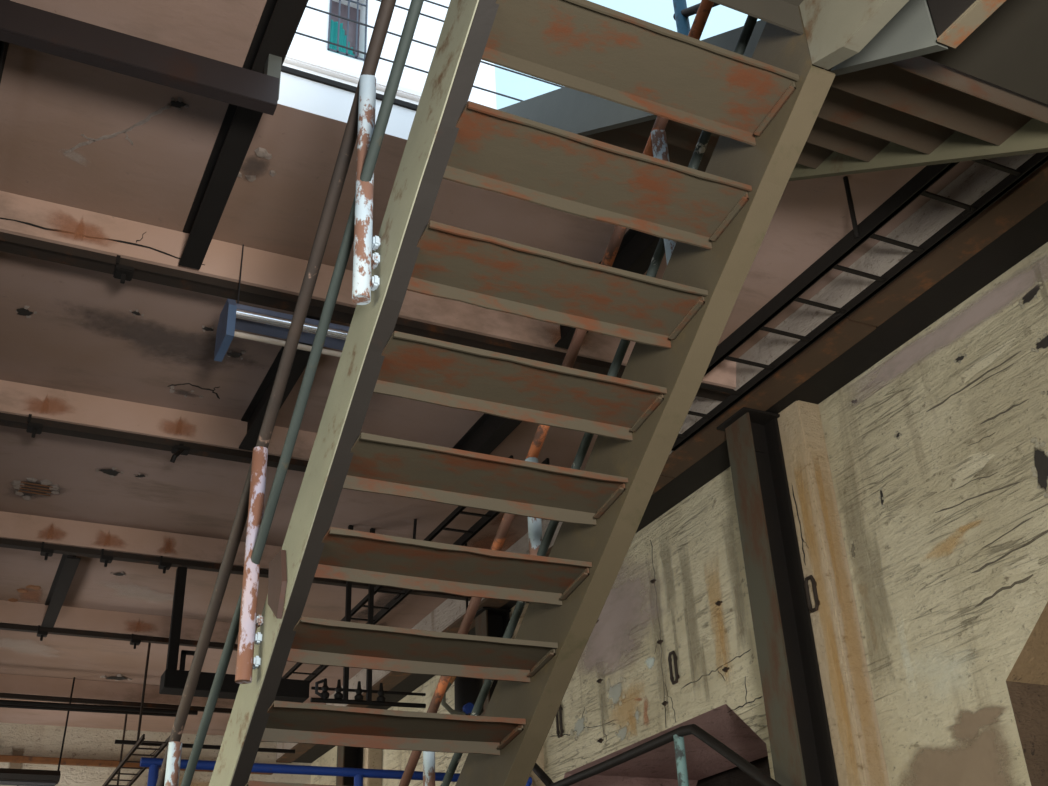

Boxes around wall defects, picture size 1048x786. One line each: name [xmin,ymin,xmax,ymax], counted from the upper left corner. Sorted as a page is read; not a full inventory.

damp [92,312,236,361]
crack [167,383,220,399]
spalling [1031,437,1048,498]
damp [651,556,708,687]